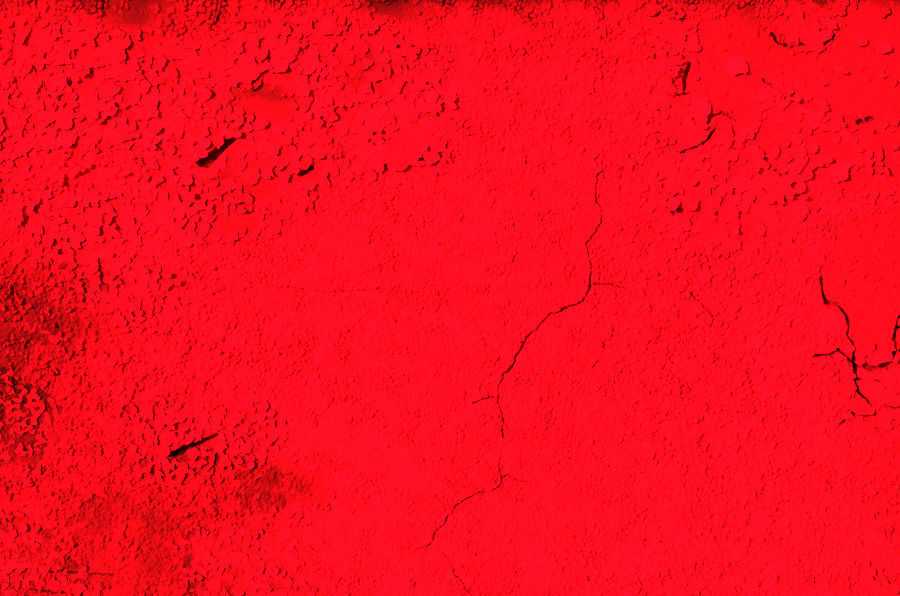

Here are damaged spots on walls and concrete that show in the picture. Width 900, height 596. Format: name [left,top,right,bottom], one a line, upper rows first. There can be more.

peeling [121,390,329,596]
peeling [0,15,473,327]
crack [399,165,629,595]
peeling [640,0,900,436]
crack [814,276,900,425]